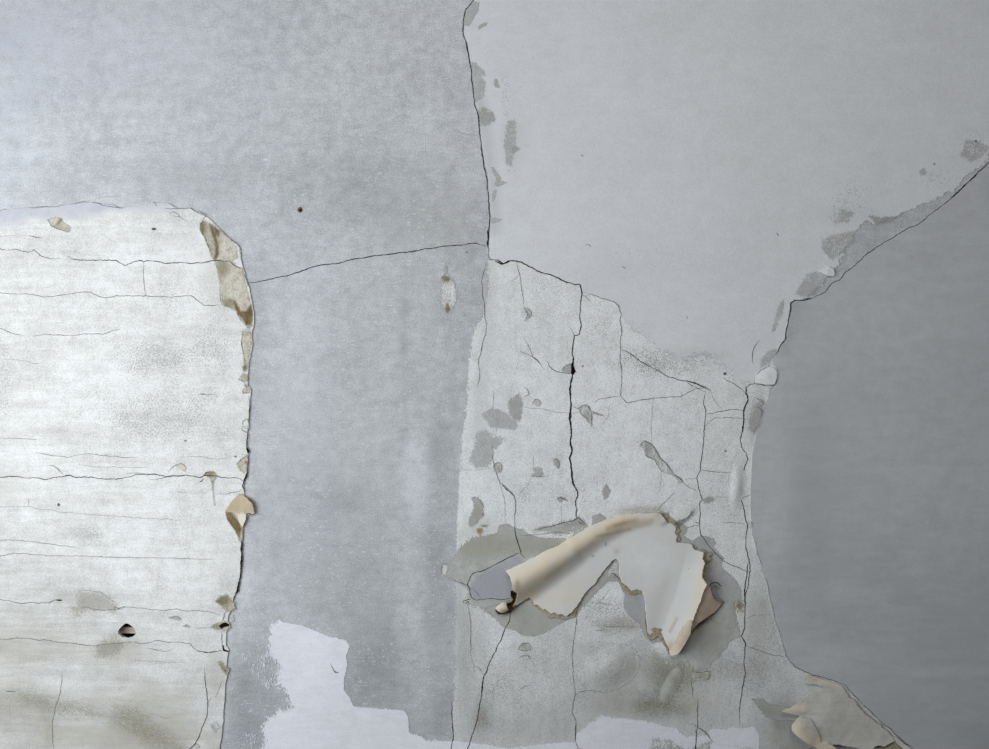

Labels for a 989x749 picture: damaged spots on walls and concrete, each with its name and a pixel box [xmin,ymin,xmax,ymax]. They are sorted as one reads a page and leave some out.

crack [86,260,221,306]
spalling [199,218,253,393]
crack [229,0,910,749]
crack [0,401,250,520]
spalling [225,494,255,542]
spalling [237,455,248,474]
crack [0,533,243,749]
peeling [441,496,745,681]
peeling [752,675,911,749]